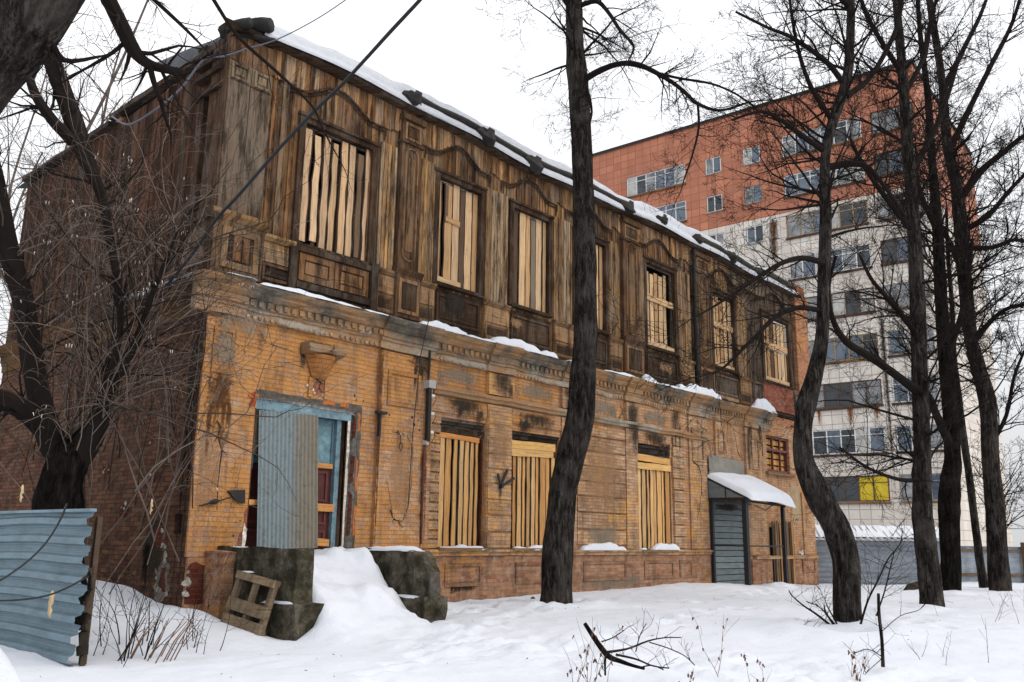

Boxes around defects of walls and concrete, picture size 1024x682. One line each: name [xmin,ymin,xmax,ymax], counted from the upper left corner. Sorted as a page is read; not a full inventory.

damp [171,321,231,605]
flaking render [249,380,362,549]
damp [450,399,483,422]
damp [520,414,554,432]